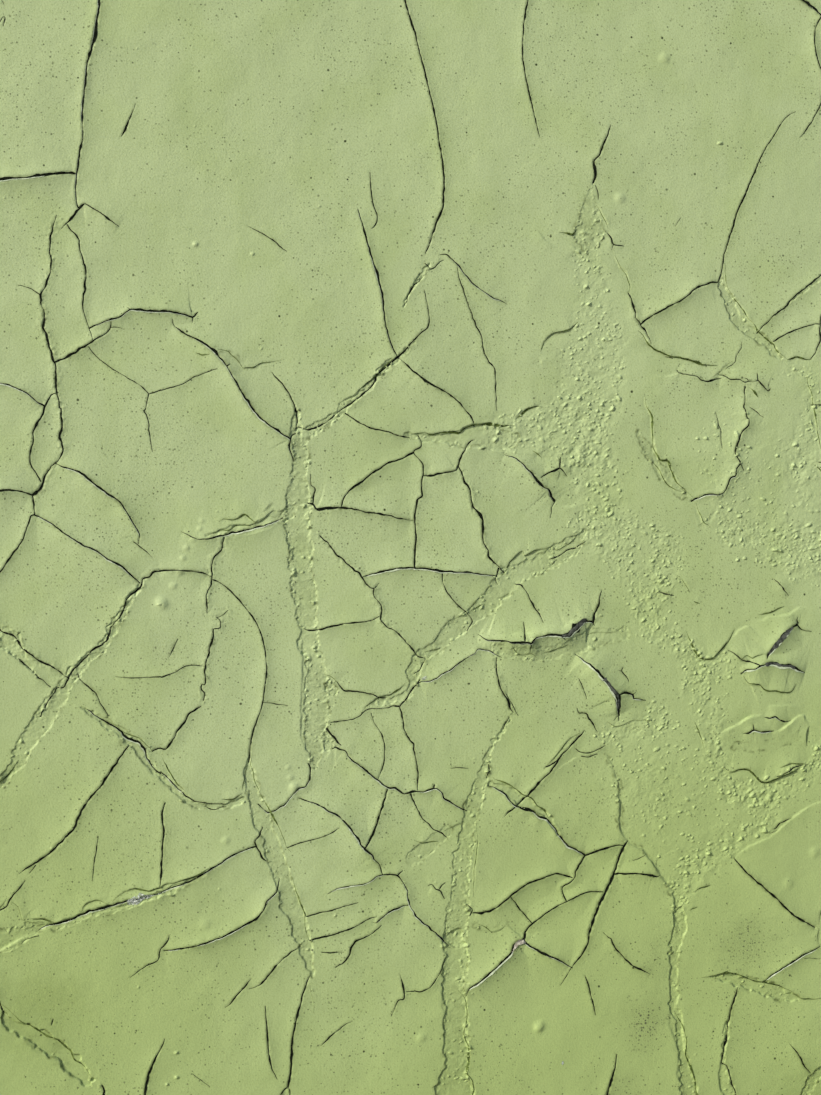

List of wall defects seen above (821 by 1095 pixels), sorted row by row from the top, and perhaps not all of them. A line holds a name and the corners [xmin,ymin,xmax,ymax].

crack [802,0,821,69]
crack [628,103,821,502]
crack [0,0,660,1016]
peeling [362,183,821,1095]
crack [724,579,812,674]
crack [743,716,788,734]
crack [734,858,820,980]
crack [144,1042,164,1095]
crack [265,976,310,1095]
crack [607,1054,617,1095]
crack [721,988,738,1095]